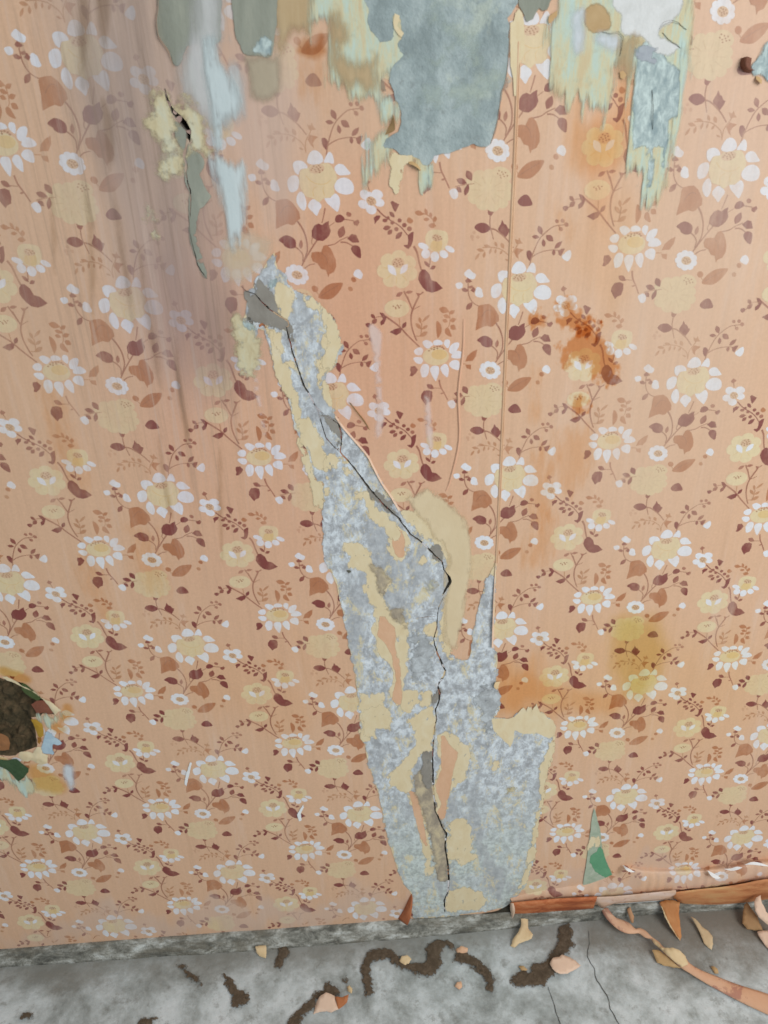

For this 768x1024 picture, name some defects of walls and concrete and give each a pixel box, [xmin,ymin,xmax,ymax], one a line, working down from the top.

peeling [740,42,768,84]
peeling [143,0,694,279]
crack [241,286,452,911]
peeling [242,253,556,918]
spalling [0,676,62,798]
spalling [64,765,74,789]
peeling [583,809,612,885]